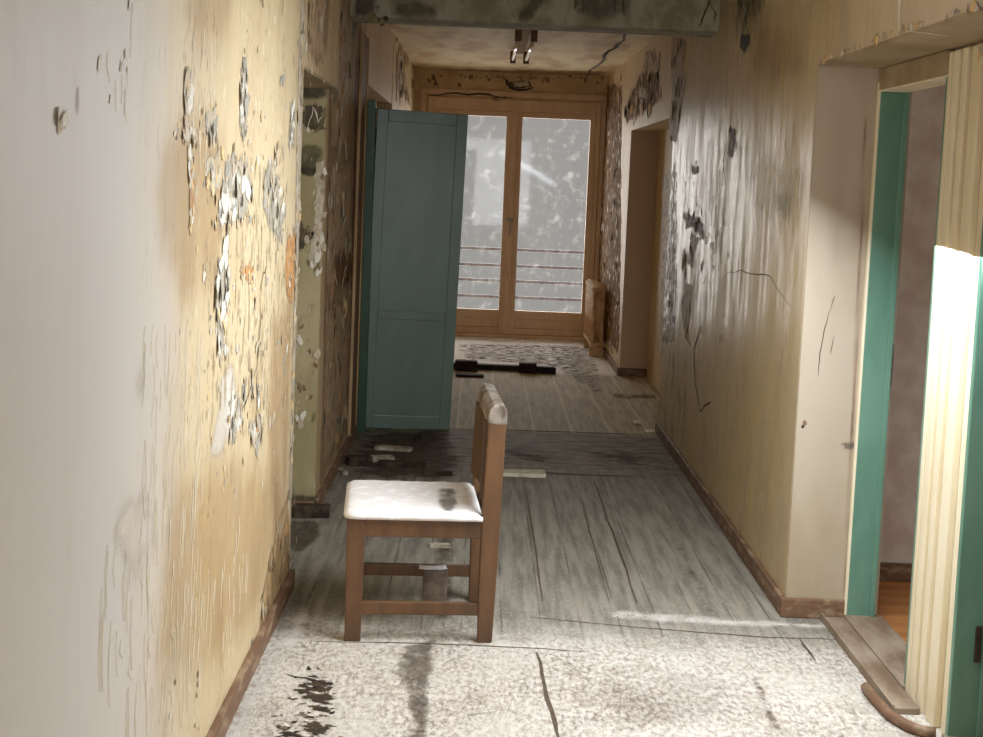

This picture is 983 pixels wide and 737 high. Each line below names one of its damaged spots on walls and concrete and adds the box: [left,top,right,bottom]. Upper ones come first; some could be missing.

peeling [426,36,686,354]
crack [587,34,626,76]
peeling [661,156,725,349]
peeling [718,125,736,172]
water stain [98,319,248,737]